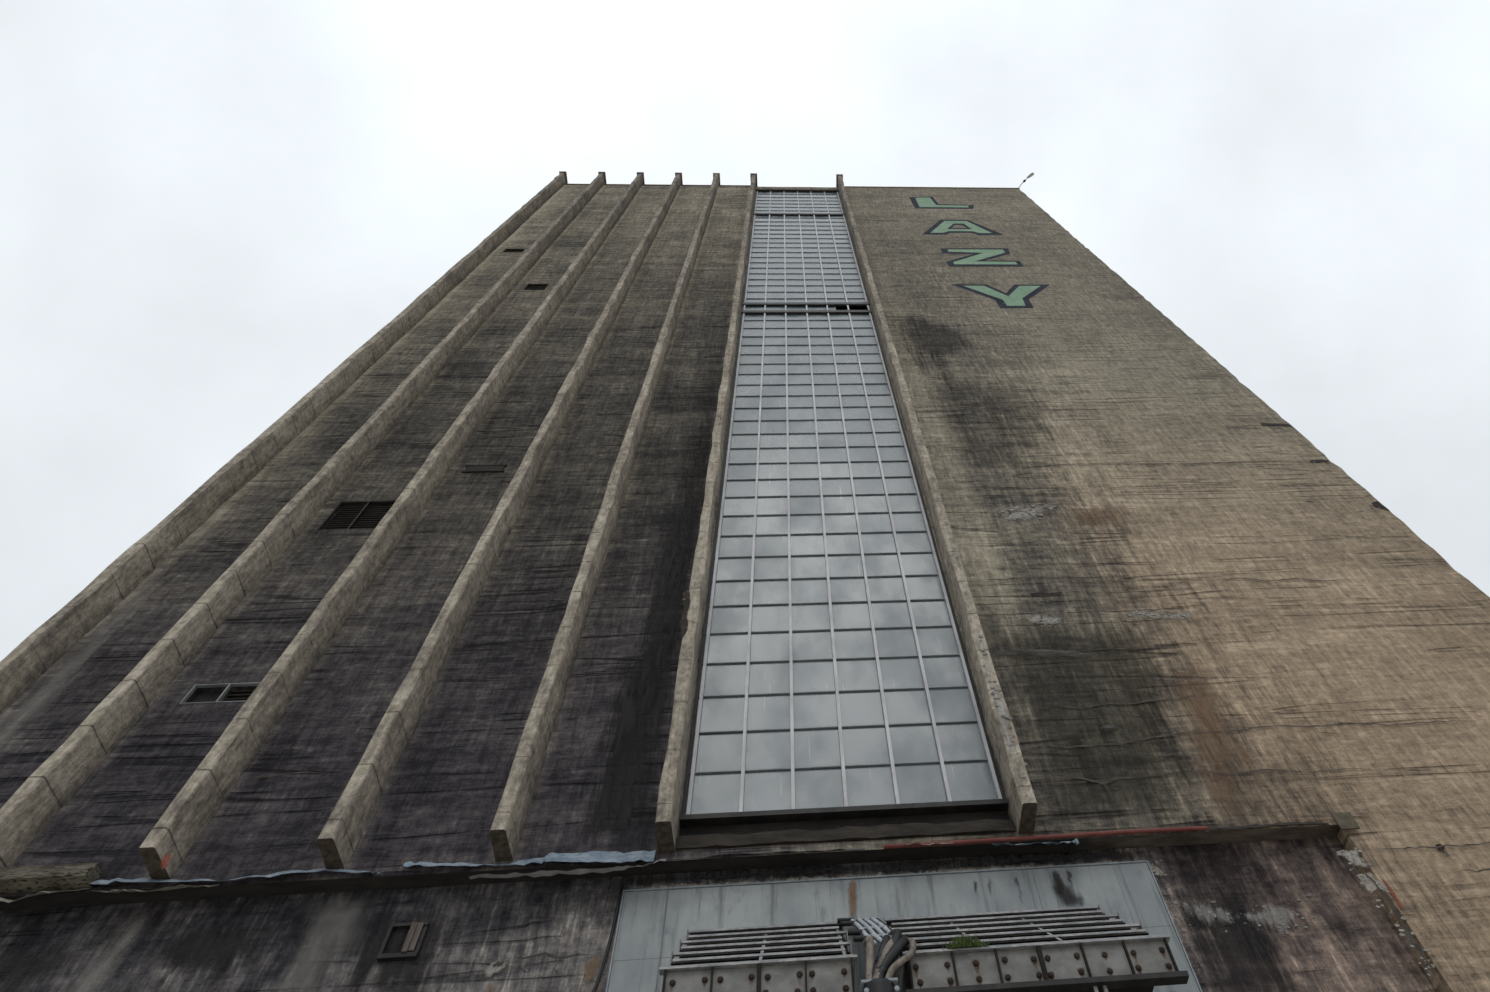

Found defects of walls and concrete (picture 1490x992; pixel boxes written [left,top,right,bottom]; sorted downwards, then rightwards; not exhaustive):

damp [1177,889,1297,992]
crack [1360,842,1490,983]